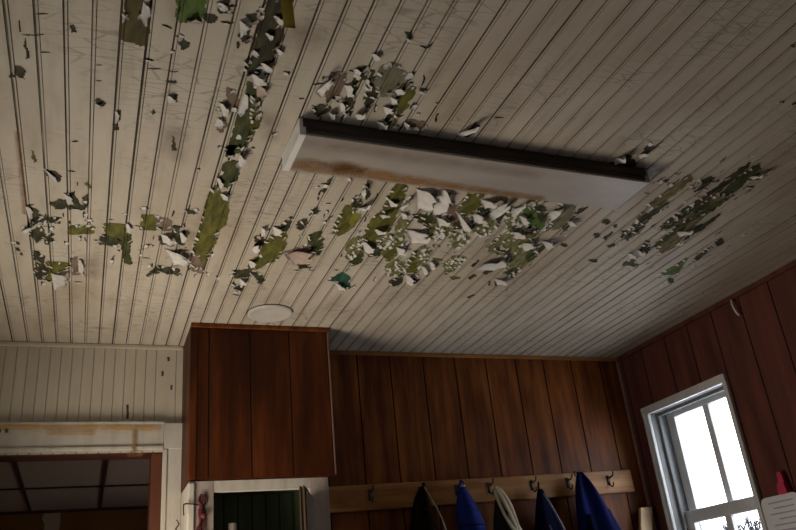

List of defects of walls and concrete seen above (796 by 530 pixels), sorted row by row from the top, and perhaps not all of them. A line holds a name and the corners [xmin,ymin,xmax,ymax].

peeling [9,0,588,296]
peeling [593,155,773,288]